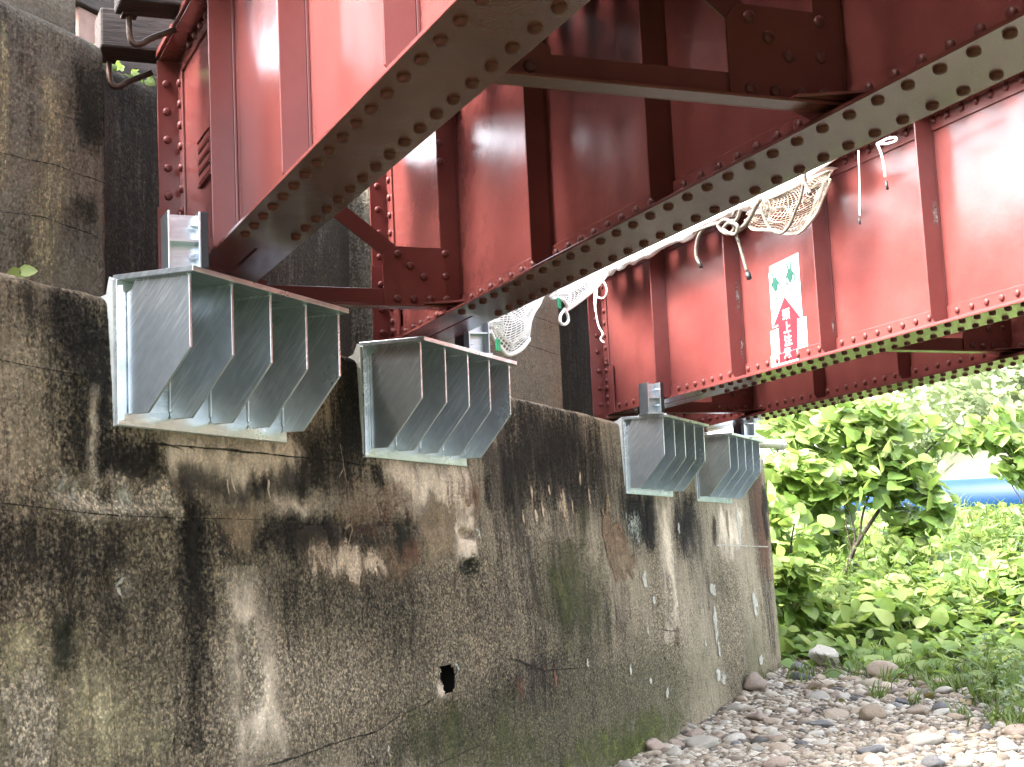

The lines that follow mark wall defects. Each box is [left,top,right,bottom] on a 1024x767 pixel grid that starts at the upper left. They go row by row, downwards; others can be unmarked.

water stain [0,21,10,185]
crack [2,503,260,520]
water stain [0,74,384,767]
crack [144,442,360,483]
water stain [483,398,603,523]
crack [269,699,433,766]